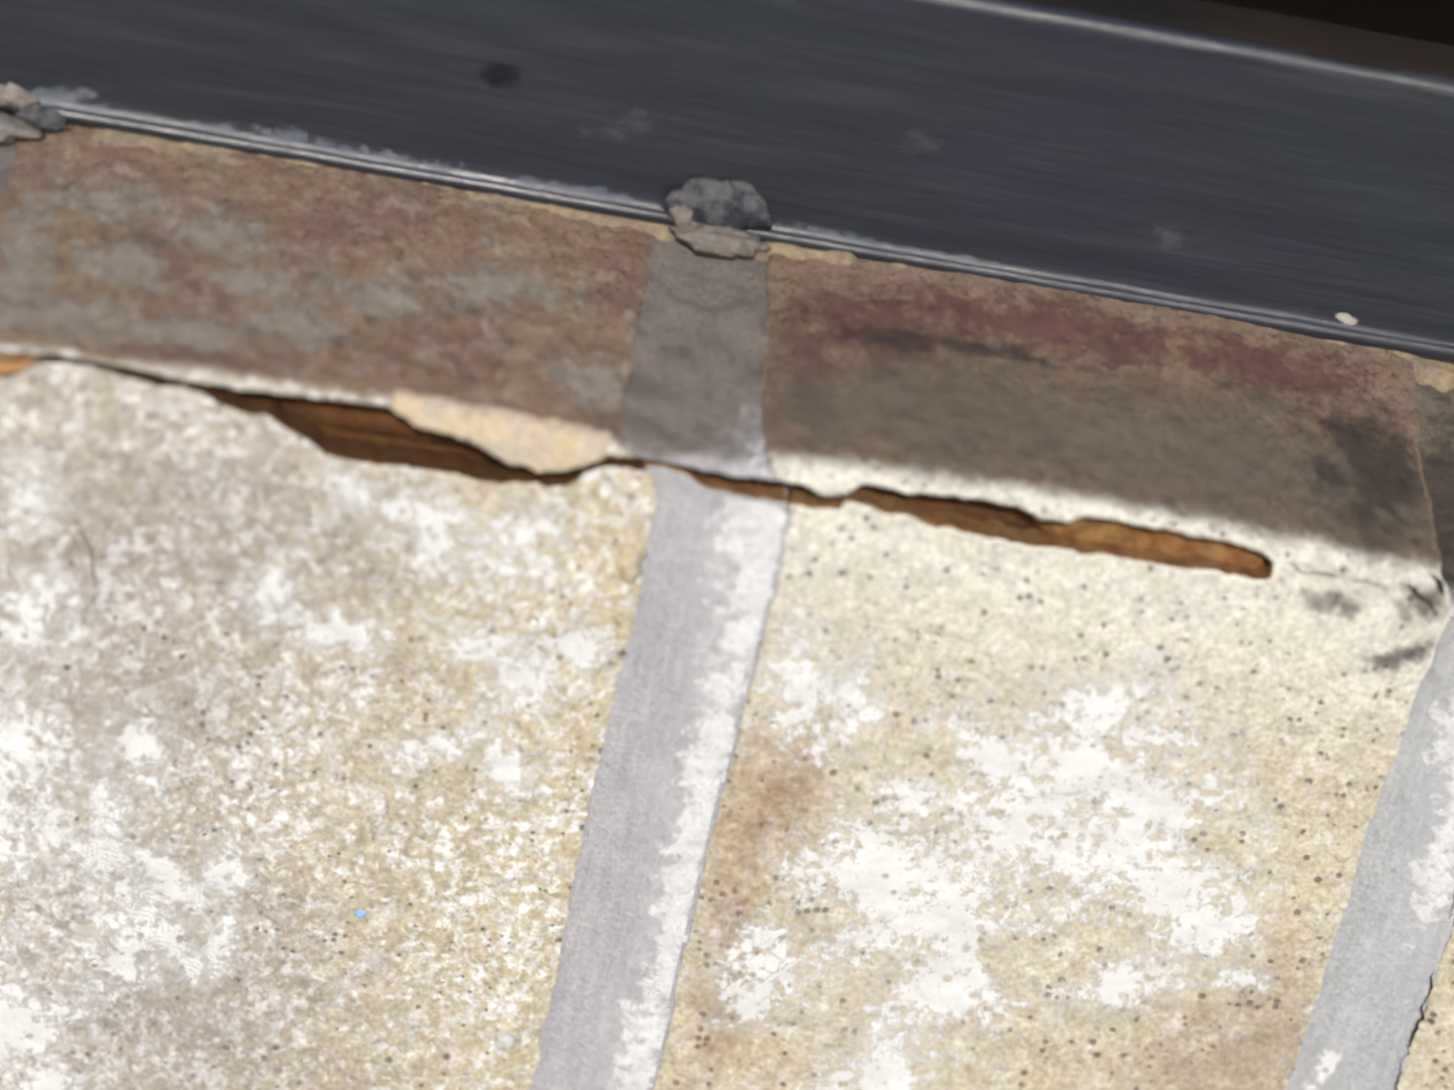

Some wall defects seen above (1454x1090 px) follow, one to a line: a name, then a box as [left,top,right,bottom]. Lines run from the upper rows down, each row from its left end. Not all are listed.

crack [59,359,204,389]
crack [266,392,498,459]
crack [1030,513,1445,665]